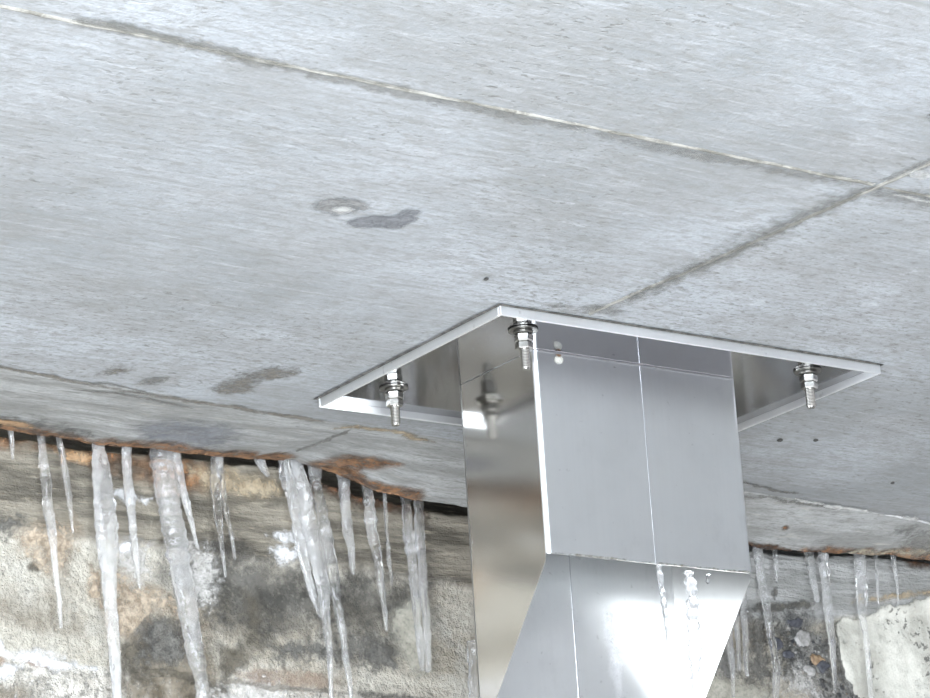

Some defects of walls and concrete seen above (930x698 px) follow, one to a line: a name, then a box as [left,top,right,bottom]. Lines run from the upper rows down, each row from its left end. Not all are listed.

rust [0,419,293,498]
rust [309,455,425,517]
rust [748,543,930,569]
damp [0,641,79,679]
damp [121,616,196,698]
damp [188,532,411,698]
spalling [715,607,865,698]